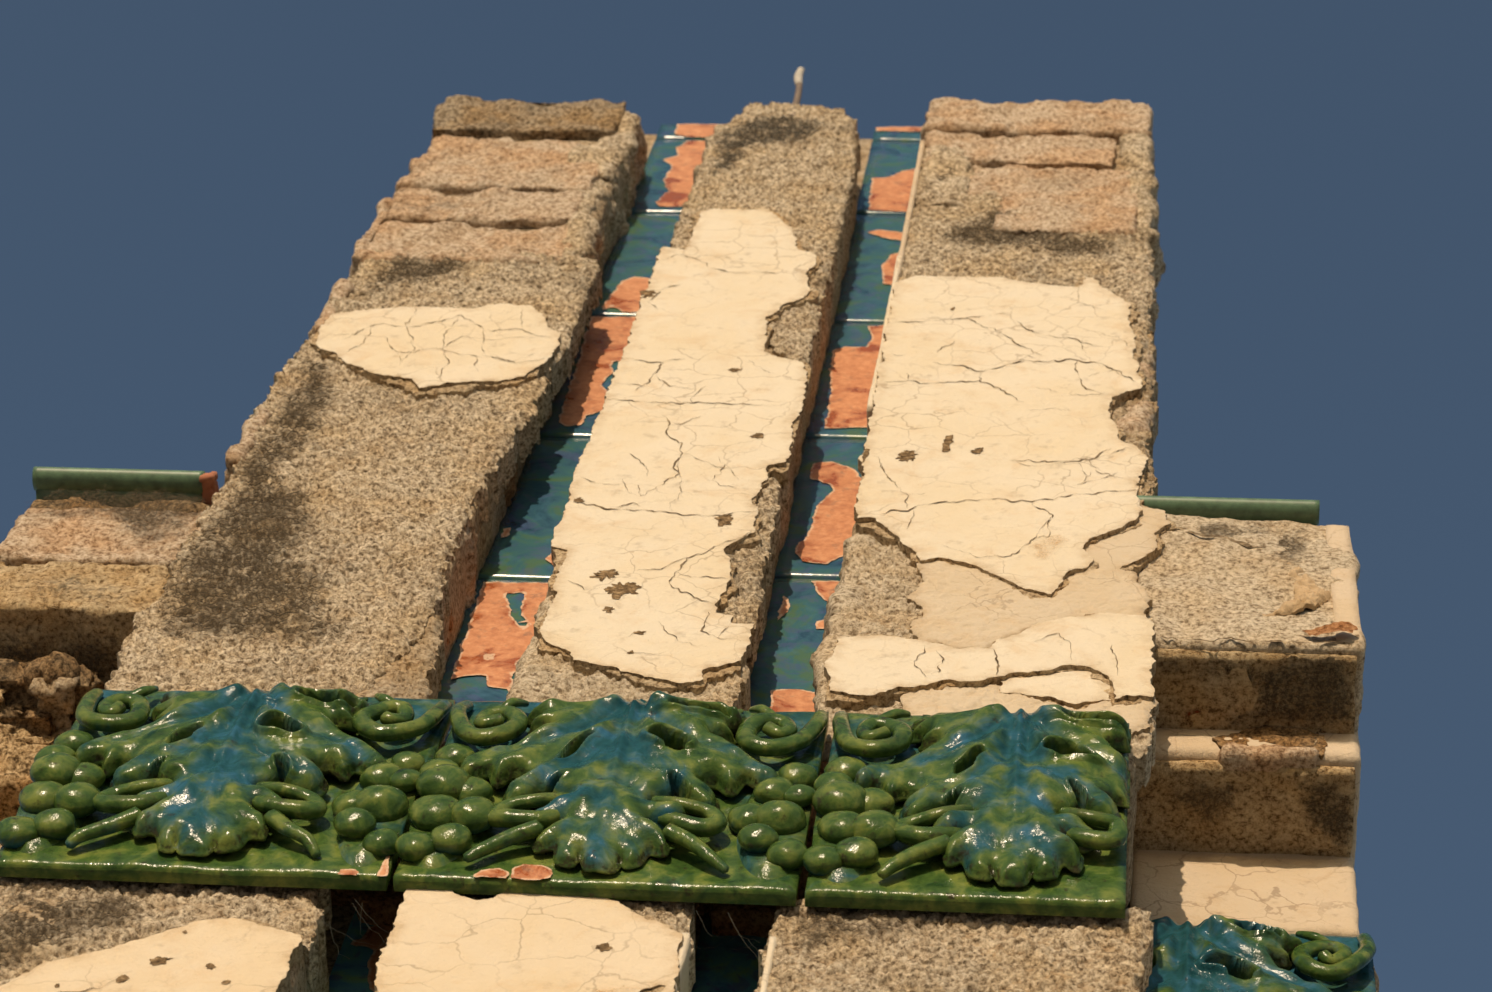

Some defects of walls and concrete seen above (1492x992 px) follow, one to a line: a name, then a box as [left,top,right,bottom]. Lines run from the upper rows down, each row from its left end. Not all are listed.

crack [339,309,548,374]
crack [648,254,776,309]
spalling [656,102,1159,496]
crack [889,288,1133,411]
water stain [37,361,345,643]
spalling [104,197,603,699]
crack [568,358,788,654]
crack [879,447,1138,558]
spalling [610,899,696,992]